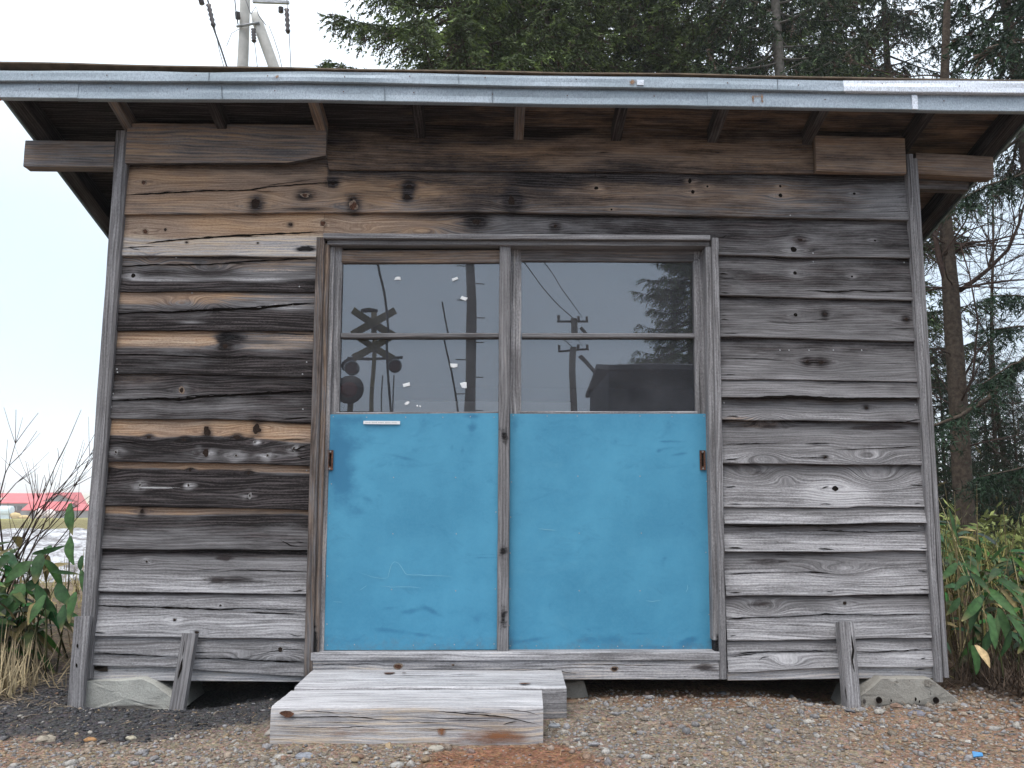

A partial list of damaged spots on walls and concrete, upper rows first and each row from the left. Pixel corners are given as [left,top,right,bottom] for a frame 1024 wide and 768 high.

crack [131,179,341,195]
crack [122,232,315,267]